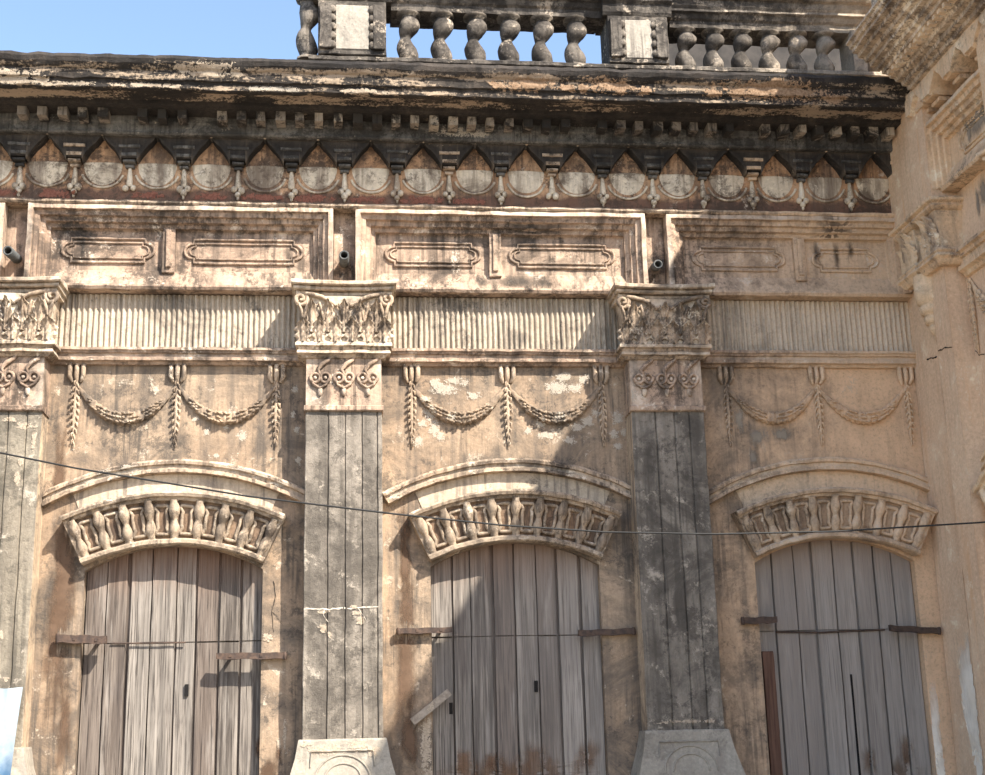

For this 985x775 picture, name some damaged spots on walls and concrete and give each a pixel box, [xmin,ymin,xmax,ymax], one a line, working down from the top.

peeling [0,67,96,87]
peeling [109,59,243,90]
peeling [489,75,655,96]
peeling [690,76,855,106]
peeling [430,117,489,138]